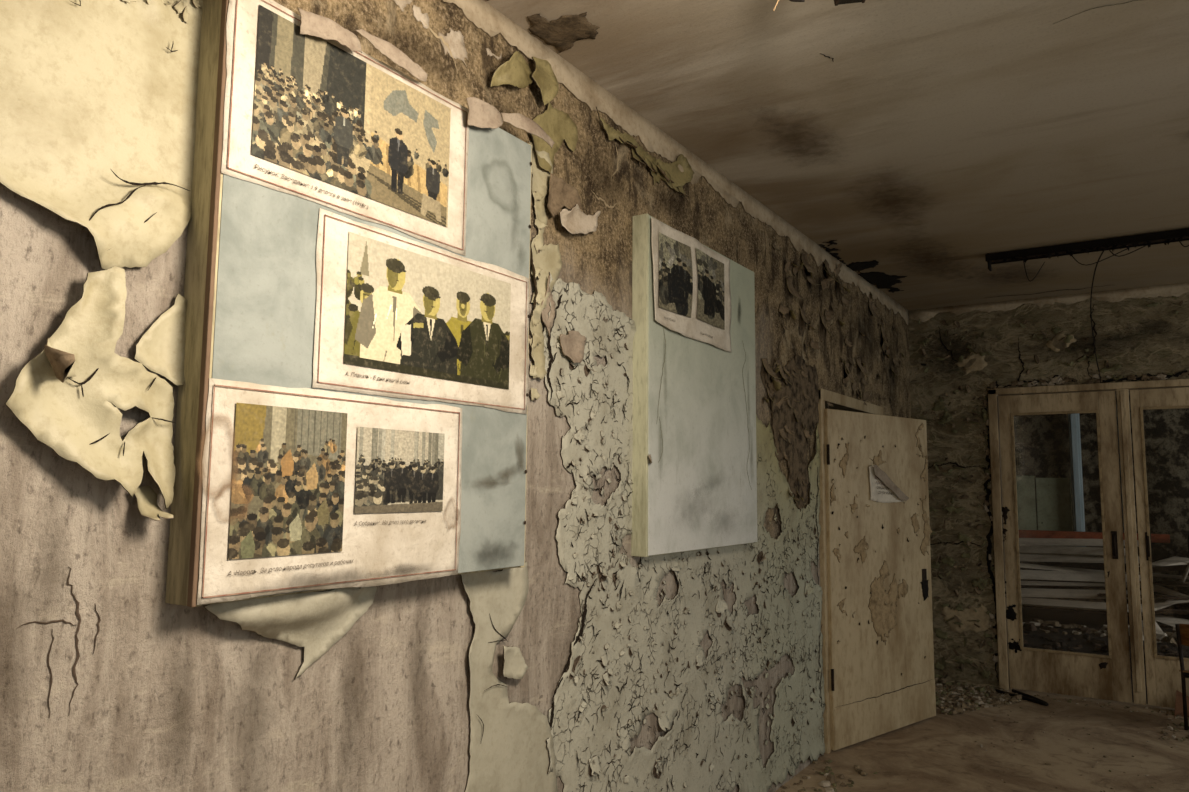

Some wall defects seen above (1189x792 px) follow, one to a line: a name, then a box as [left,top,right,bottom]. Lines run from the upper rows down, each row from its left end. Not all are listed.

peeling [527,12,600,53]
peeling [0,0,203,521]
crack [82,170,190,230]
peeling [460,102,905,792]
crack [16,567,101,718]